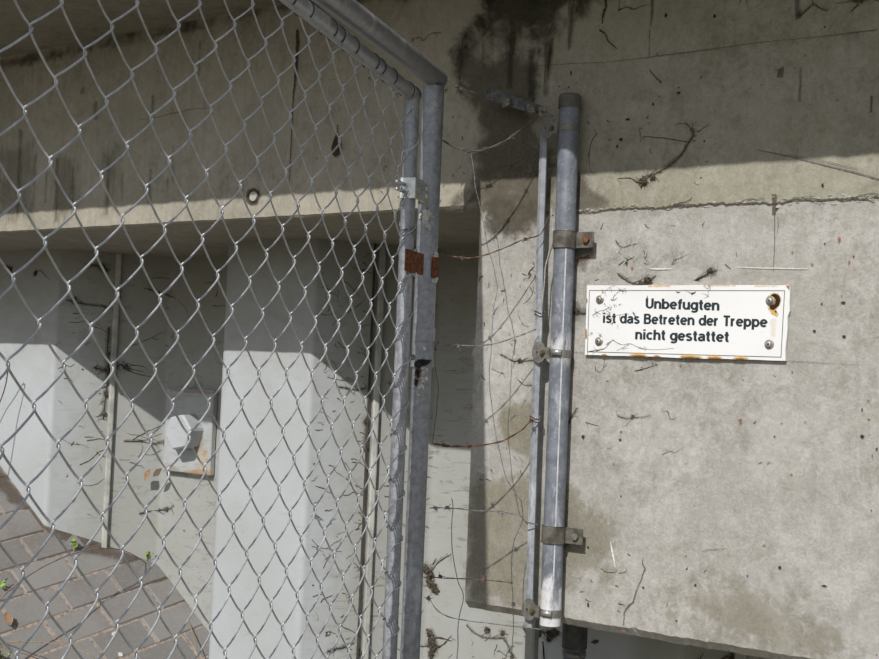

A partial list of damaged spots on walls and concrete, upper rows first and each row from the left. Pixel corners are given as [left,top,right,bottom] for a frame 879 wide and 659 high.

damp [454,0,590,233]
crack [577,149,879,270]